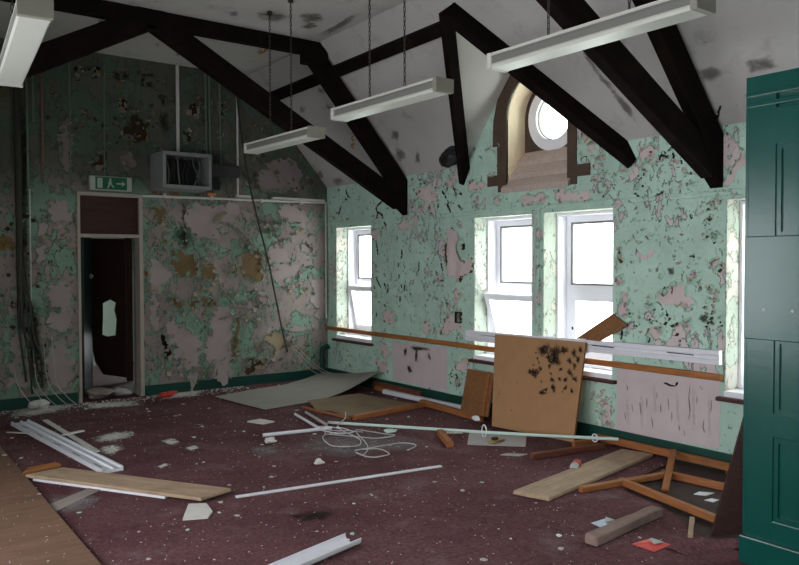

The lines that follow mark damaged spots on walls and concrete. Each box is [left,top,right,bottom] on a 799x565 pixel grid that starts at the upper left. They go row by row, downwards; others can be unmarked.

peeling [4,198,77,394]
flaking render [119,113,151,172]
peeling [146,146,328,391]
peeling [370,172,495,338]
peeling [448,356,478,394]
peeling [493,133,726,345]
peeling [697,150,746,244]